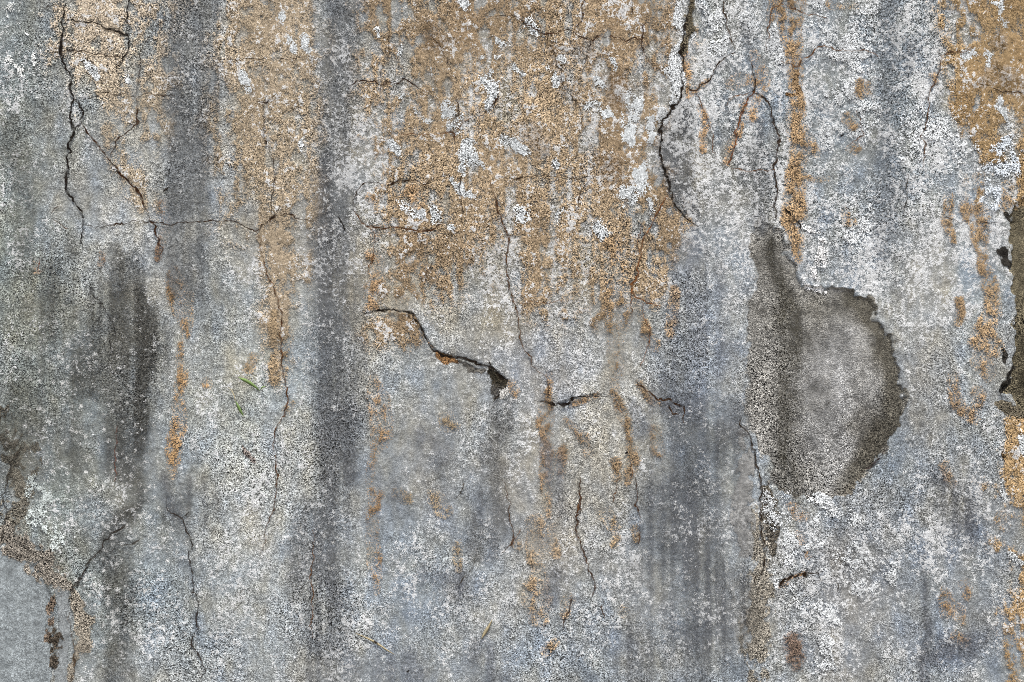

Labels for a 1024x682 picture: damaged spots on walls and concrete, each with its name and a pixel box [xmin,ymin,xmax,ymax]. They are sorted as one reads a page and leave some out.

crack [67,524,145,681]
damp [72,246,158,680]
crack [166,501,206,681]
crack [37,0,651,553]
peeling [345,0,1024,682]
crack [630,0,878,423]